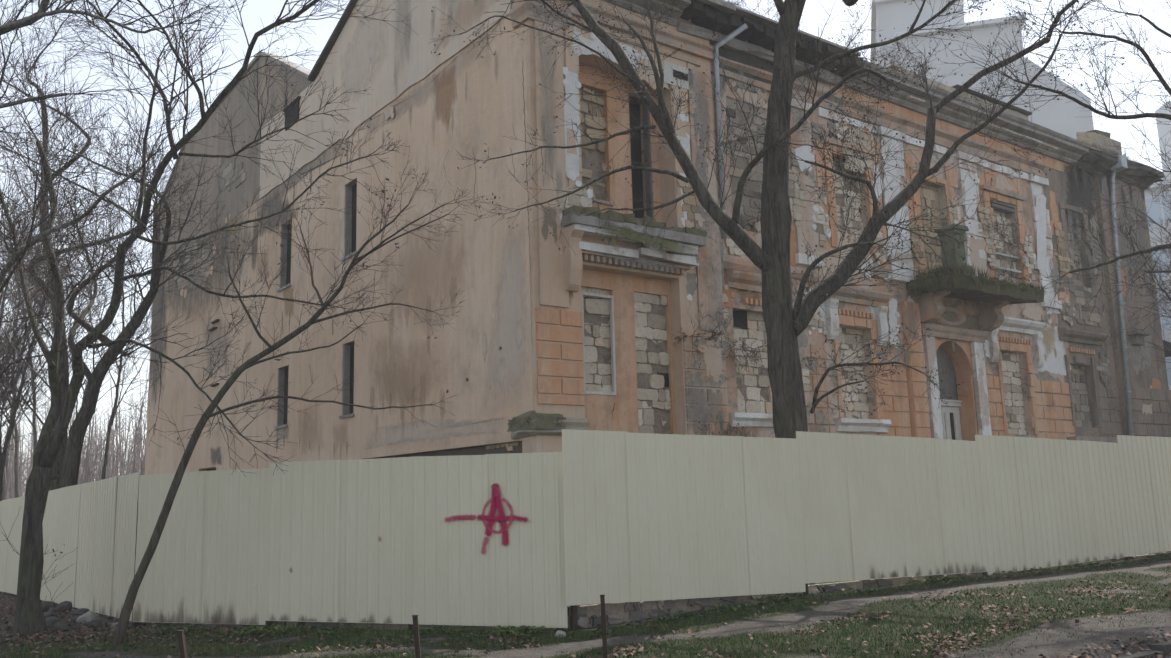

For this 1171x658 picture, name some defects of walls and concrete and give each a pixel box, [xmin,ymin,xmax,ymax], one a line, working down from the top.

peeling [557,67,602,220]
flaking render [571,26,768,249]
peeling [789,121,925,282]
leakage [482,247,524,388]
peeling [696,340,723,377]
spalling [720,239,762,329]
flaking render [797,302,827,392]
peeling [888,296,916,348]